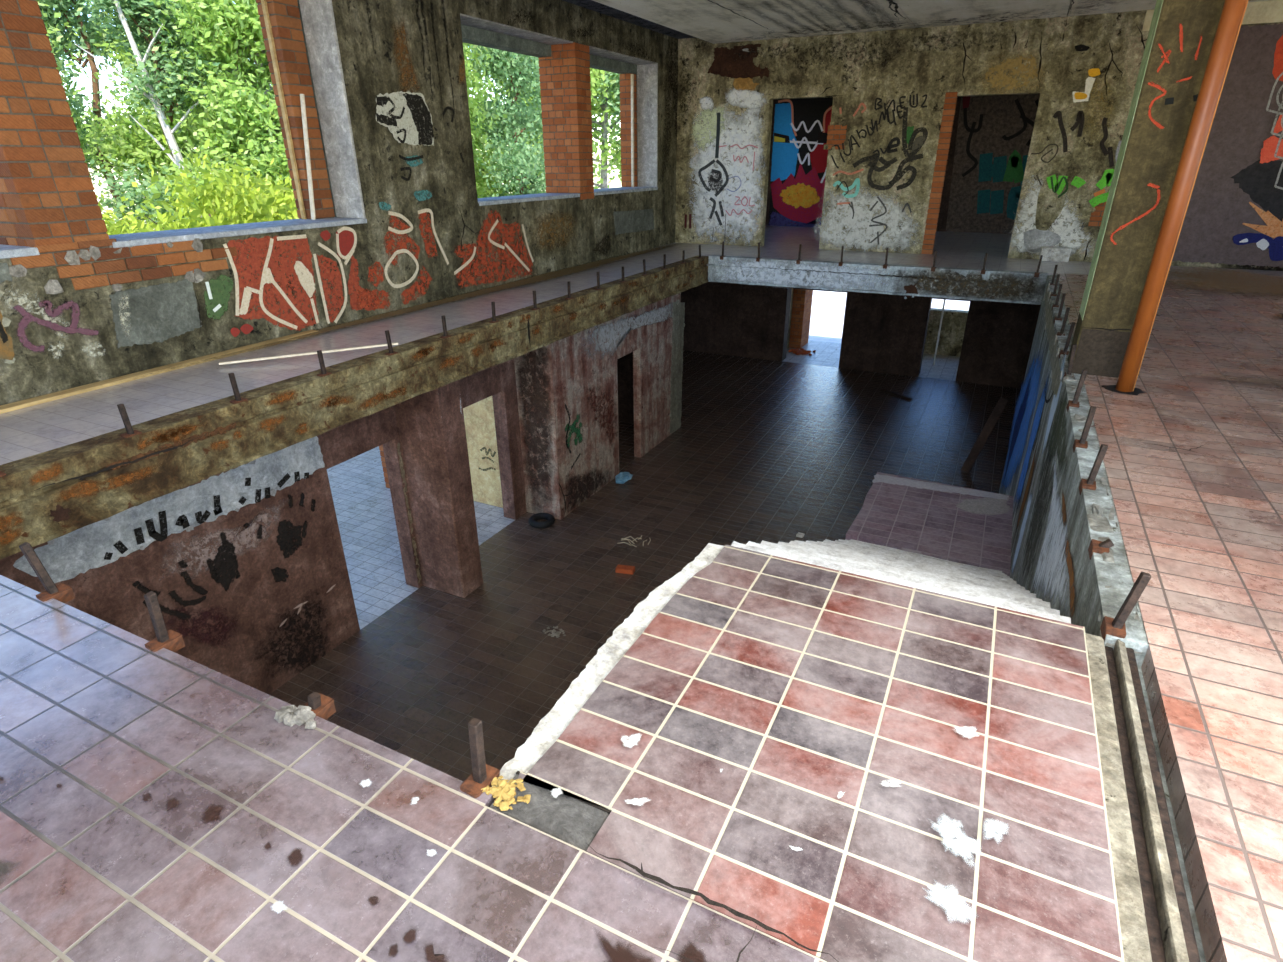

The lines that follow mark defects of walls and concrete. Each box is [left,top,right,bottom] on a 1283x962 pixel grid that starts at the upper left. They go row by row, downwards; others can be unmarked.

crack [887,0,905,18]
corrosion [412,314,540,370]
corrosion [320,387,406,409]
corrosion [139,425,198,450]
corrosion [31,465,152,500]
crack [595,851,838,962]